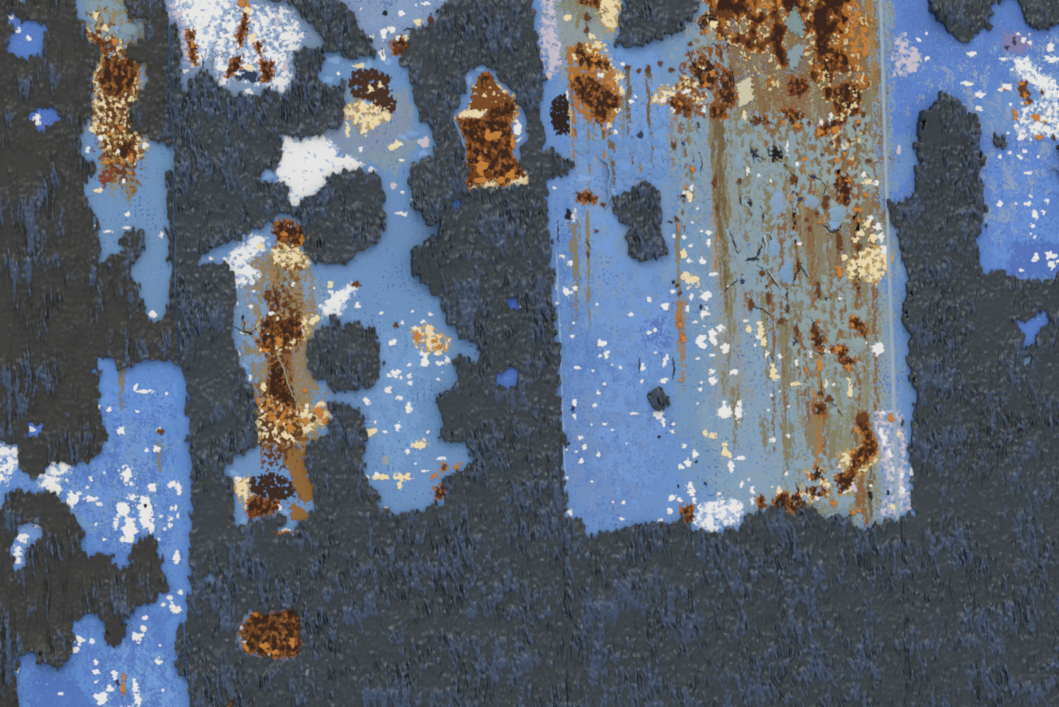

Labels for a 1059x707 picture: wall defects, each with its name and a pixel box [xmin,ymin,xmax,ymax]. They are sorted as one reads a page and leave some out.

peeling [7,0,48,60]
peeling [0,357,218,707]
corrosion [85,1,148,206]
peeling [73,0,177,323]
corrosion [238,609,302,660]
corrosion [239,217,331,535]
peeling [164,0,482,535]
corrosion [348,68,397,135]
corrosion [454,70,527,194]
peeling [451,0,924,539]
corrosion [549,0,896,528]
peeling [960,28,1059,141]